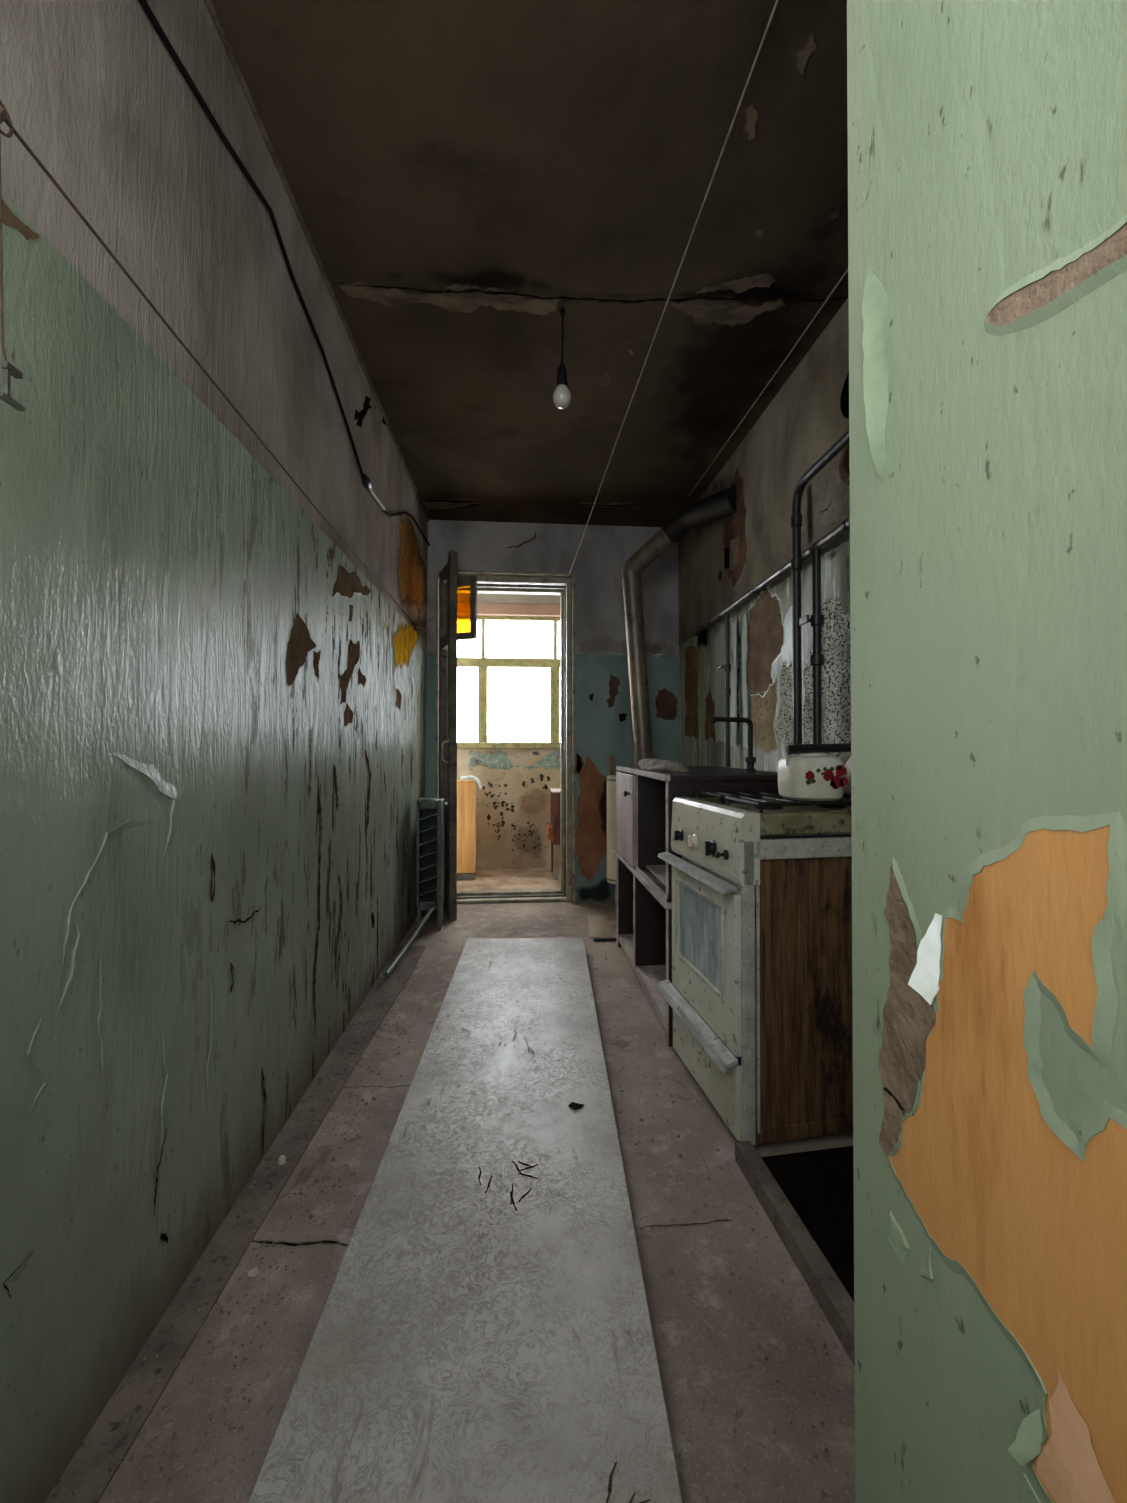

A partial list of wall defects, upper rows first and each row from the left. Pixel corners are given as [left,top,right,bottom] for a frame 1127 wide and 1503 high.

crack [334,270,849,328]
spalling [984,214,1127,336]
peeling [284,611,321,688]
peeling [331,563,371,728]
flaking render [654,585,851,754]
peeling [469,749,616,882]
peeling [878,812,1127,1503]